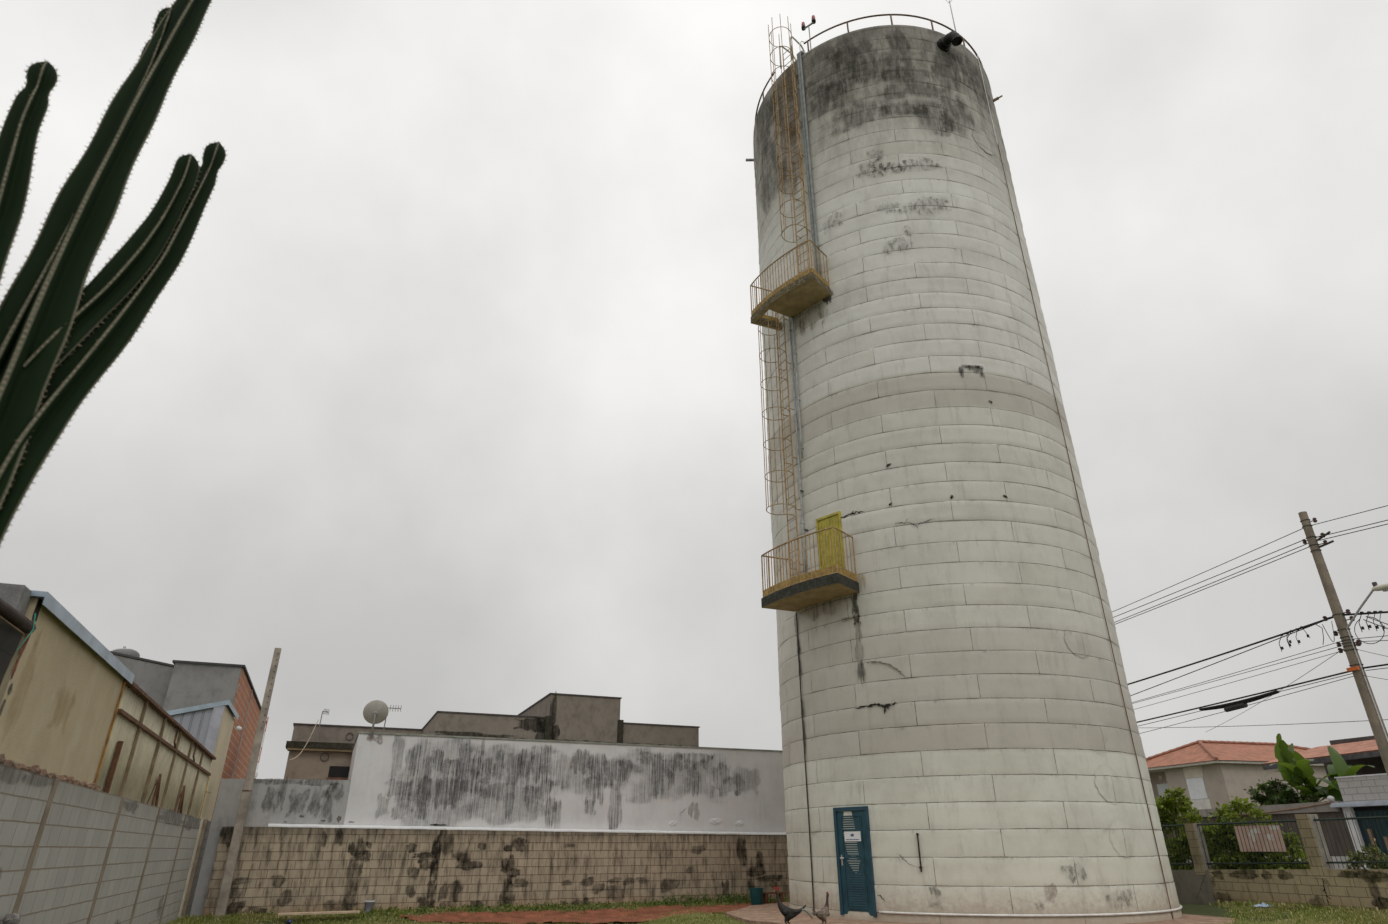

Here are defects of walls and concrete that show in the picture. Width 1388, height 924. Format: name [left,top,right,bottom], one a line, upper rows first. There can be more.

leakage [808,36,990,134]
crack [855,702,896,714]
leakage [410,691,561,825]
leakage [263,782,371,910]
leakage [406,835,486,908]
leakage [500,837,527,907]
leakage [736,838,783,890]